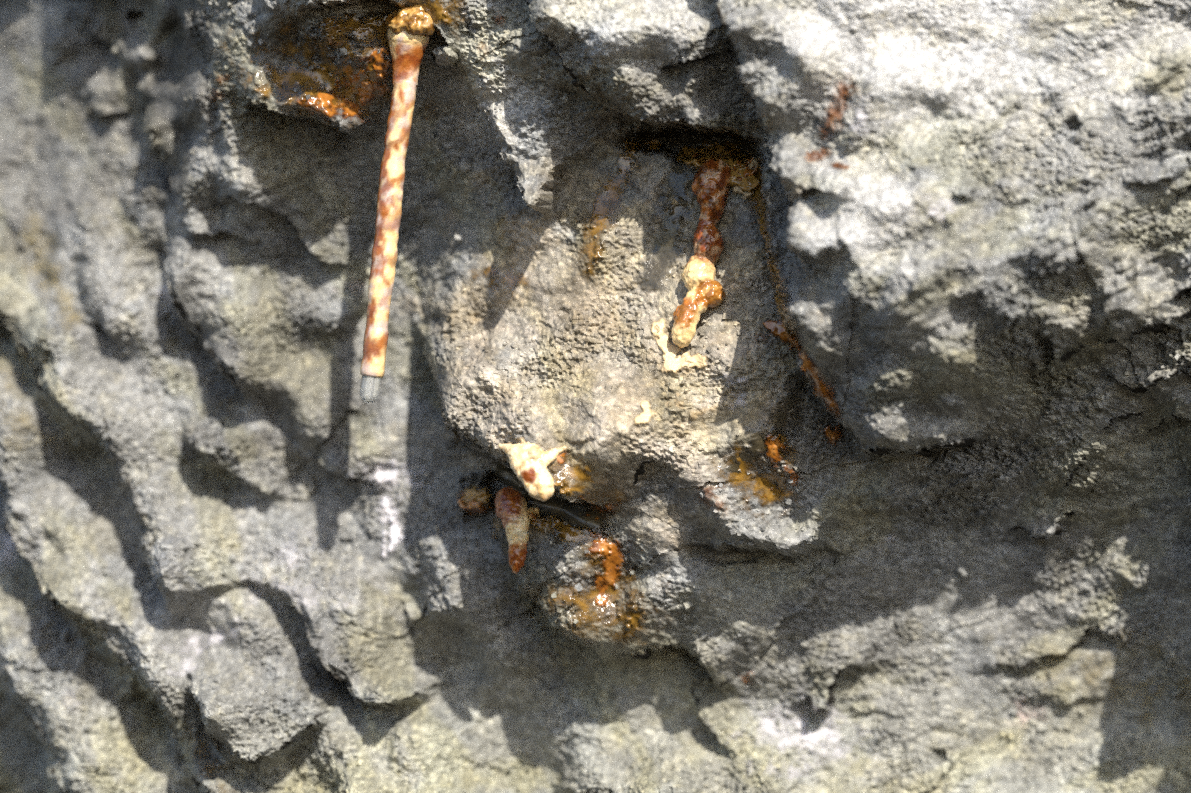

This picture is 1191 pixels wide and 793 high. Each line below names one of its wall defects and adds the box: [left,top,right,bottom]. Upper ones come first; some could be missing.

rust [240,14,393,129]
rust [750,189,843,445]
rust [546,452,646,645]
rust [719,434,799,506]